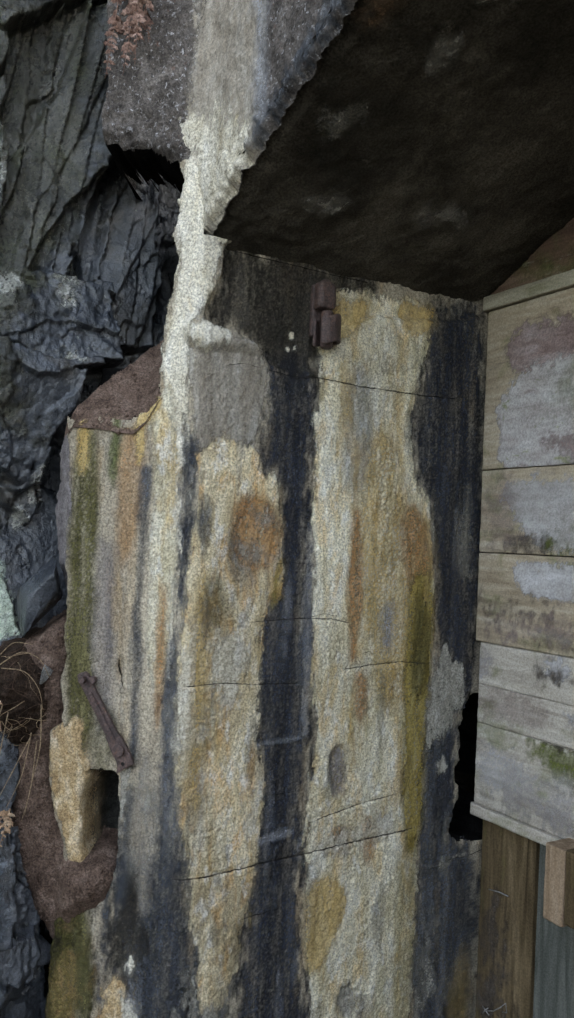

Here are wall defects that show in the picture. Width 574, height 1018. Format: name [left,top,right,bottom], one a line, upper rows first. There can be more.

damp [55,428,88,593]
damp [73,0,508,1018]
damp [507,536,551,554]
damp [537,668,561,687]
damp [49,717,99,863]
crack [172,794,412,881]